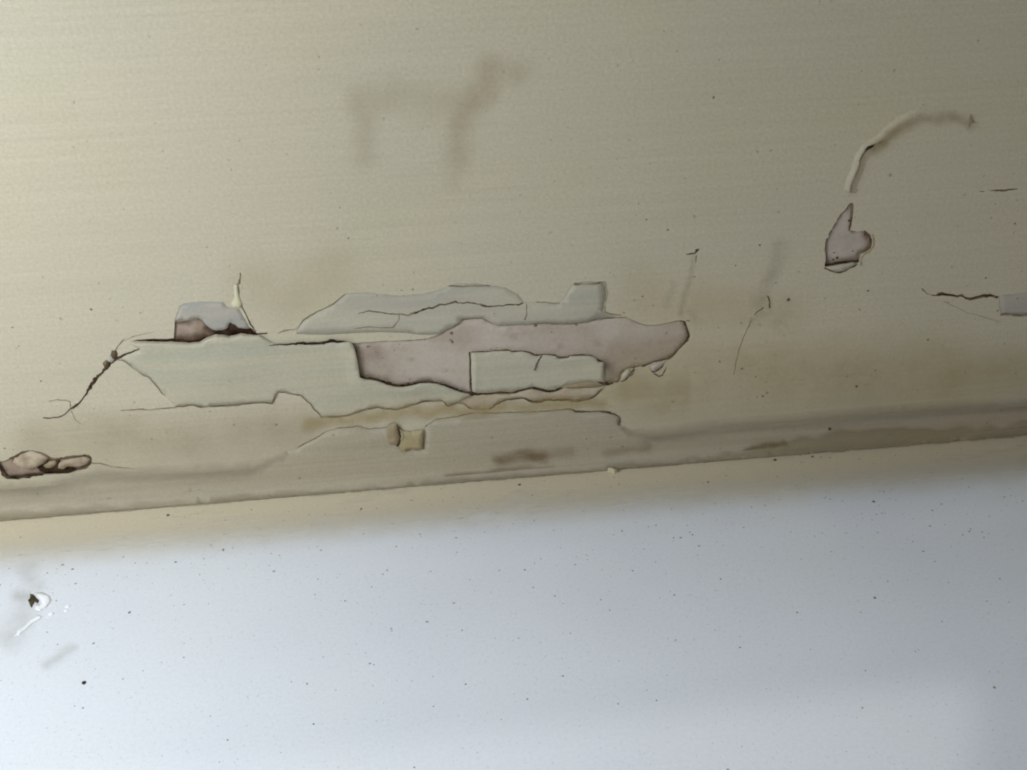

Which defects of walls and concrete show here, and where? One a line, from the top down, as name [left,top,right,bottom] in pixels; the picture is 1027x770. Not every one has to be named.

peeling [824,203,875,273]
crack [922,288,1001,322]
peeling [999,292,1027,317]
peeling [134,273,690,410]
crack [44,332,152,423]
peeling [387,423,424,452]
spalling [0,450,135,480]